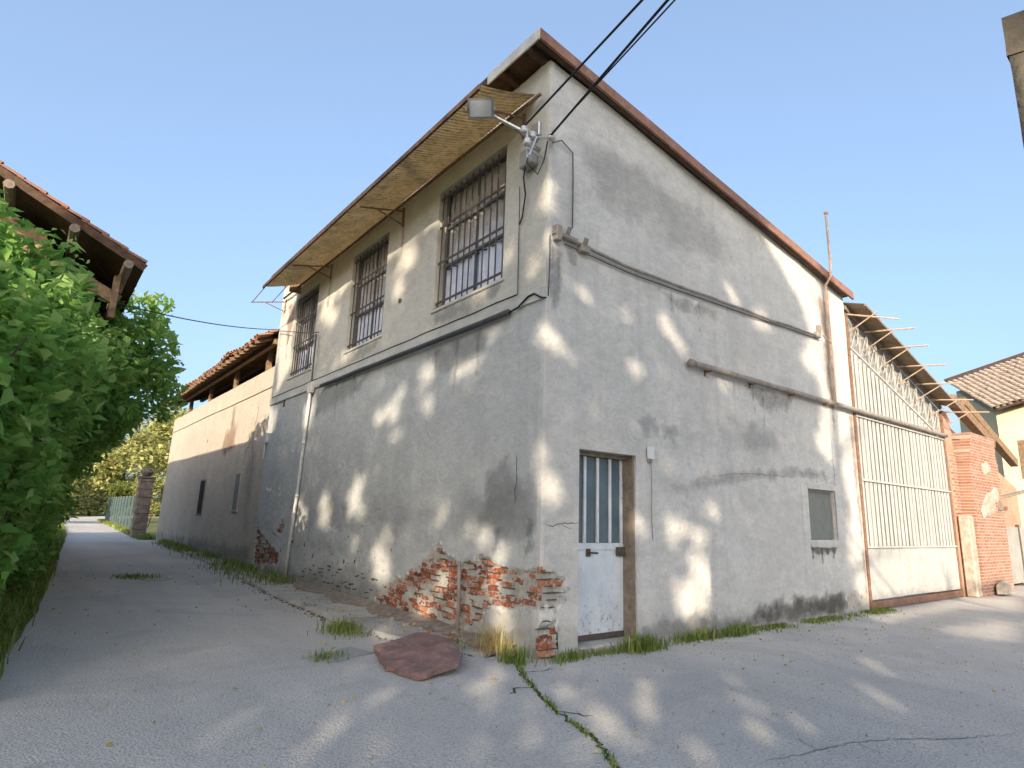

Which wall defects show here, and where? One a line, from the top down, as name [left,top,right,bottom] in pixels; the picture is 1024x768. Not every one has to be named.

spalling [253,519,571,659]
water stain [748,594,846,625]